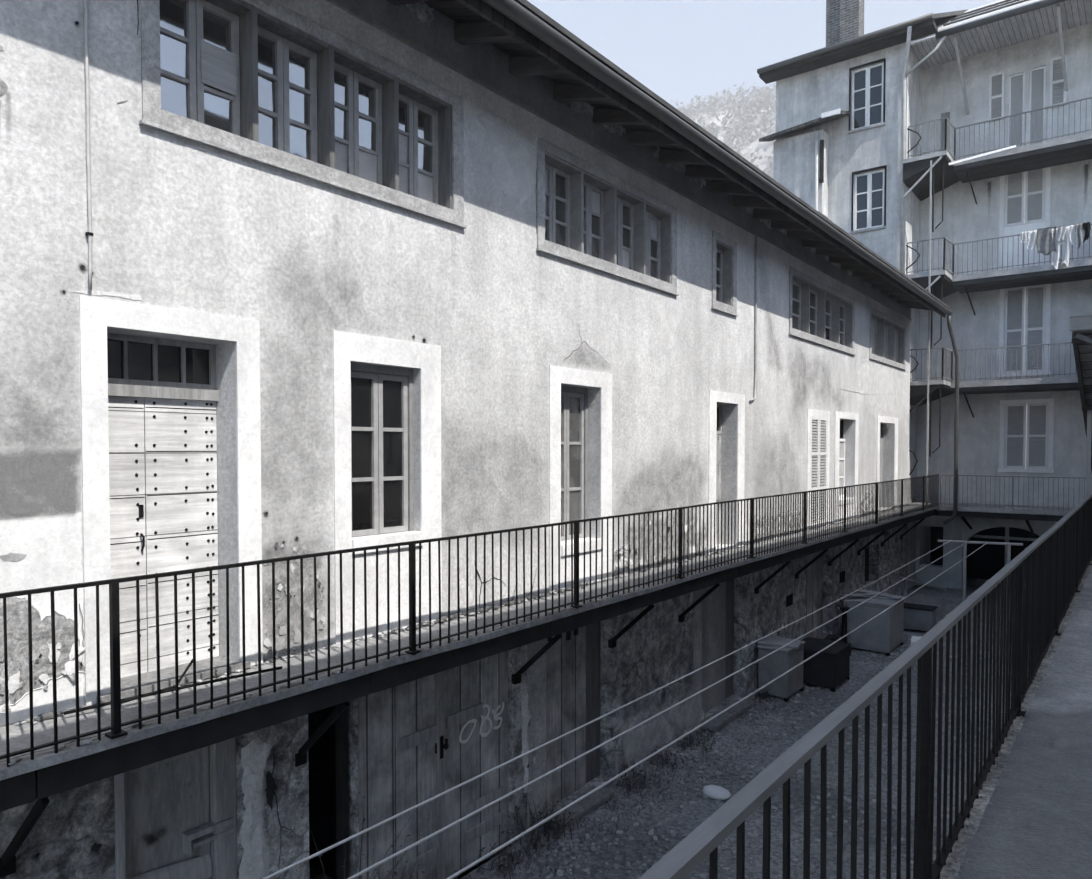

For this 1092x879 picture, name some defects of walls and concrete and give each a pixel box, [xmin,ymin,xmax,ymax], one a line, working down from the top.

spalling [0,597,86,713]
spalling [239,737,299,879]